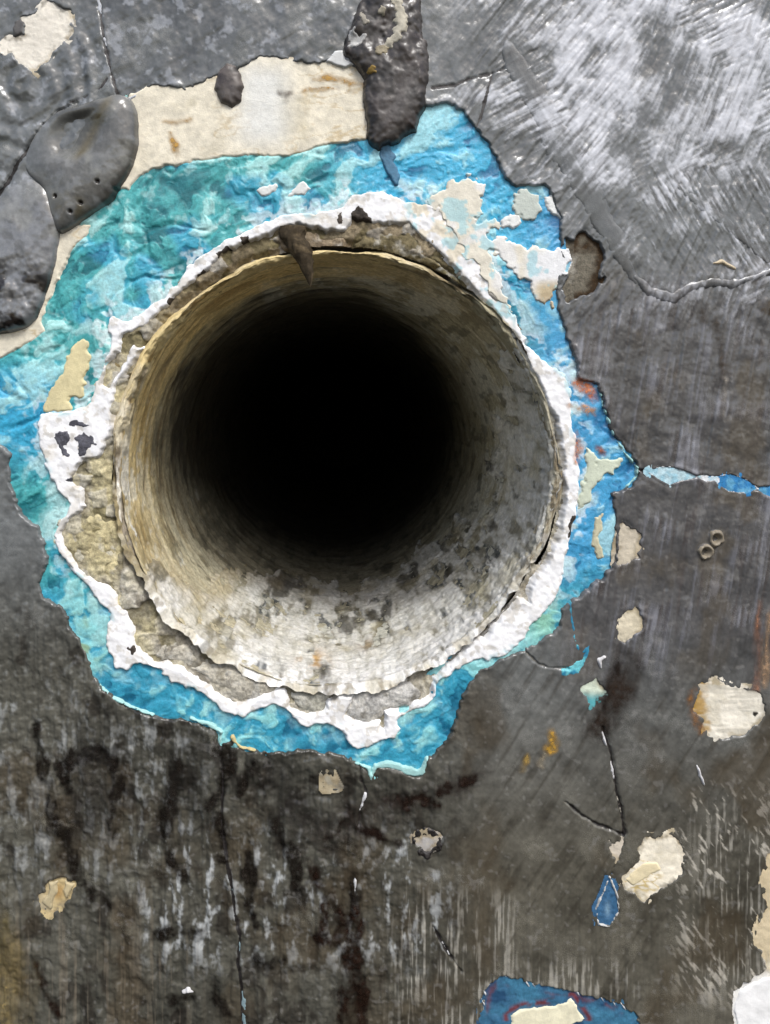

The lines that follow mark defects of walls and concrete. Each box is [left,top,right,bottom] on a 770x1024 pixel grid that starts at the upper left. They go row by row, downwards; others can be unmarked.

peeling [0,56,770,780]
crack [569,726,627,837]
crack [219,744,246,1024]
peeling [592,828,685,927]
peeling [476,976,639,1024]